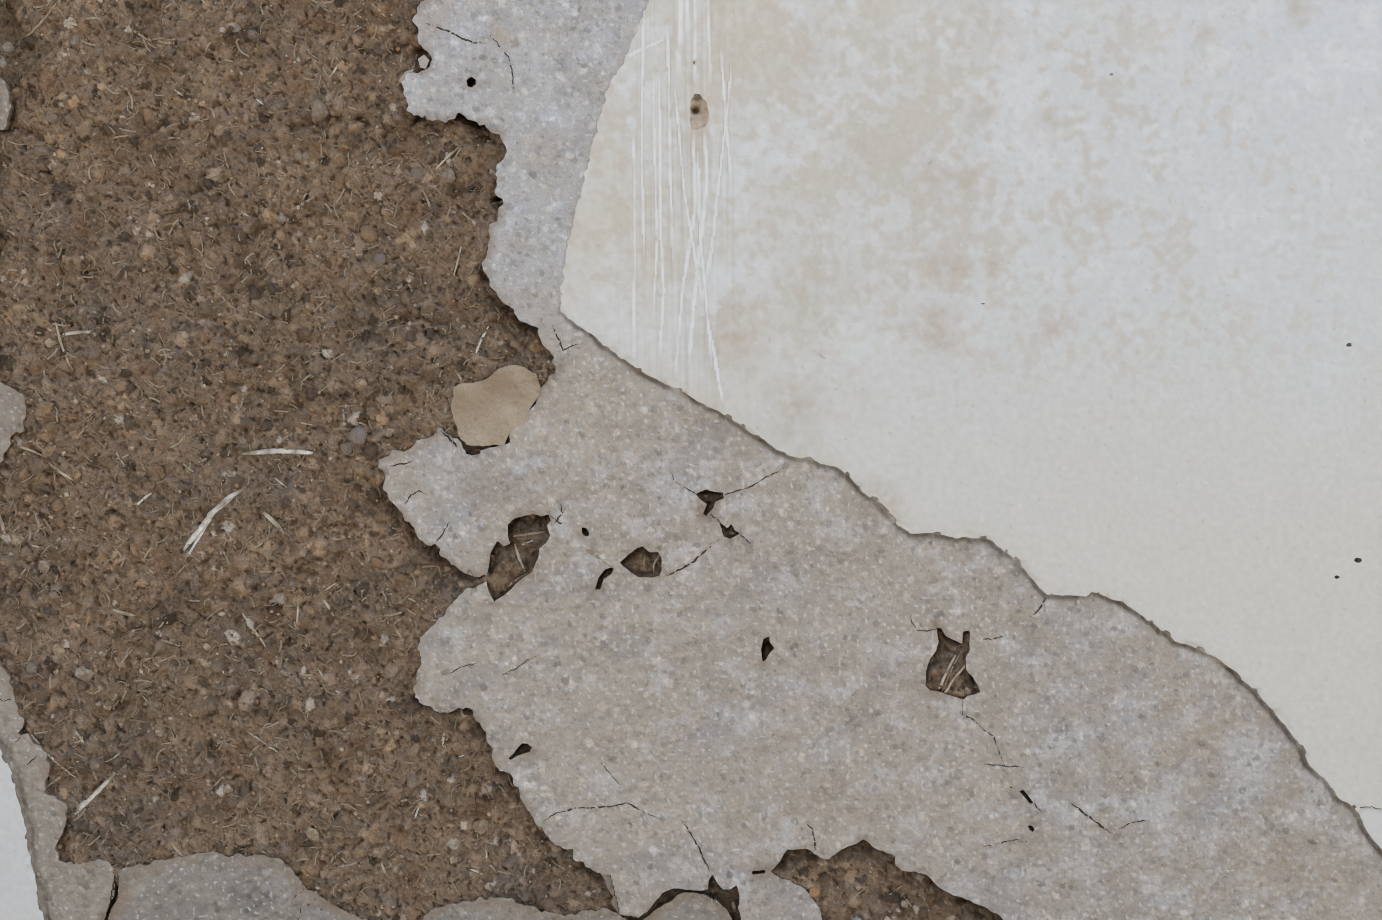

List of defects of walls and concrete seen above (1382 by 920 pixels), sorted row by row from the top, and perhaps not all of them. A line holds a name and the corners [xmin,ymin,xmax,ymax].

spalling [0,0,616,920]
flaking render [378,0,1382,920]